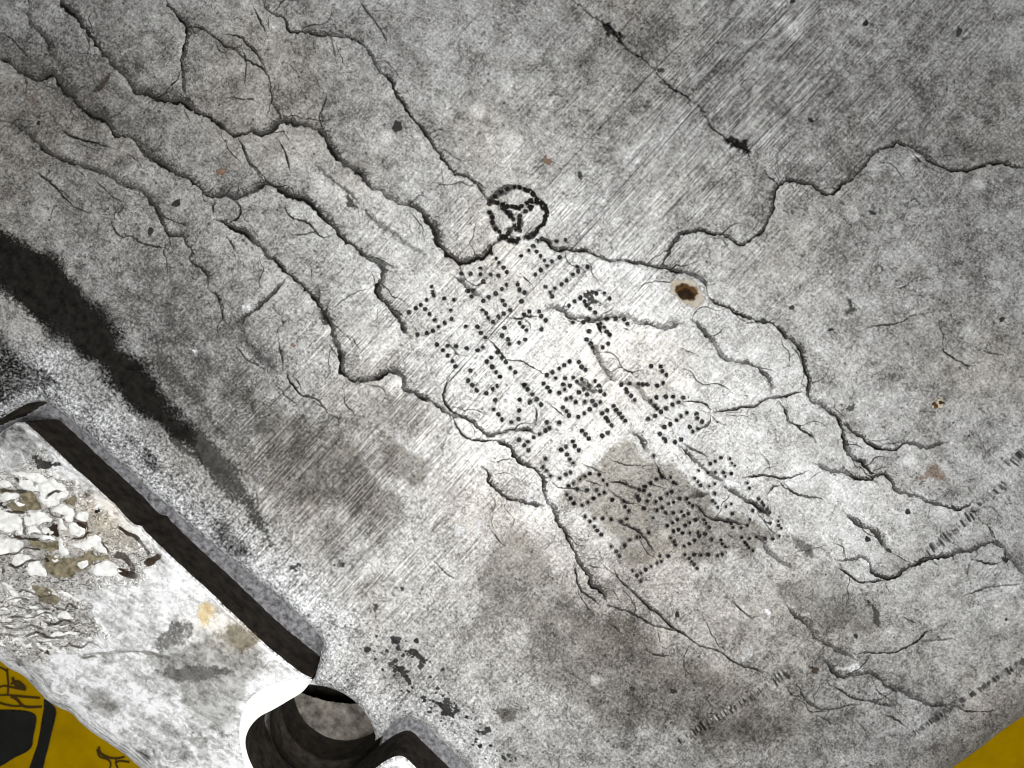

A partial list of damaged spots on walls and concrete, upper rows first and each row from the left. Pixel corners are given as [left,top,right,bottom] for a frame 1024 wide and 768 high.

water stain [0,330,55,404]
crack [0,0,761,672]
rust [671,278,704,307]
crack [510,139,1024,553]
water stain [32,455,62,469]
peeling [0,466,122,659]
water stain [142,452,163,473]
water stain [169,428,273,548]
water stain [214,521,256,557]
crack [838,515,1021,595]
peeling [364,635,517,762]
crack [787,610,990,725]